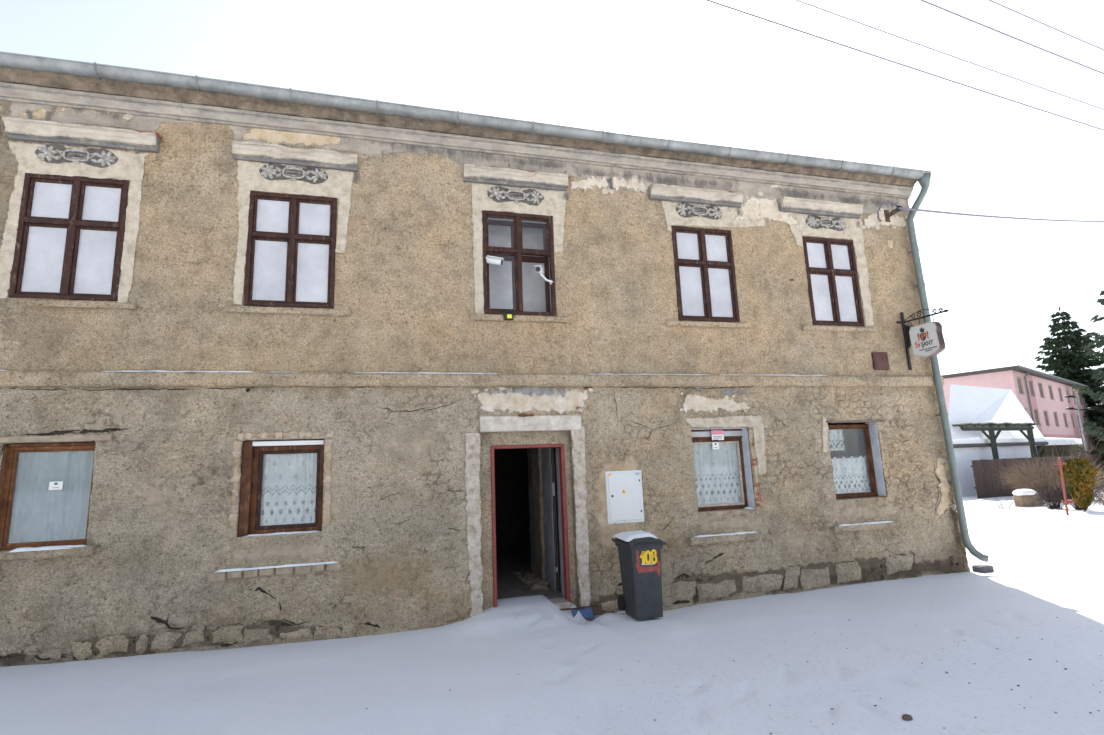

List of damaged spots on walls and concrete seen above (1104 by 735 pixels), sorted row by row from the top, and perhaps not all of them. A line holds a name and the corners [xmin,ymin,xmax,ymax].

peeling [570,175,652,195]
peeling [733,185,799,228]
peeling [860,207,907,249]
crack [9,385,248,393]
crack [356,387,466,417]
peeling [471,387,593,414]
peeling [679,393,750,414]
crack [23,428,127,444]
crack [129,616,238,648]
crack [0,642,96,661]